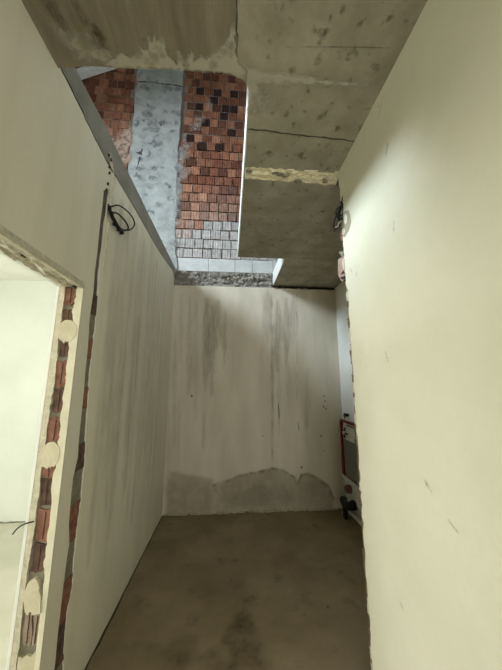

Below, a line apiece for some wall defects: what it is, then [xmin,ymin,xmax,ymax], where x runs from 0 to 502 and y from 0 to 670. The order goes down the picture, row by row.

crack [247,128,354,142]